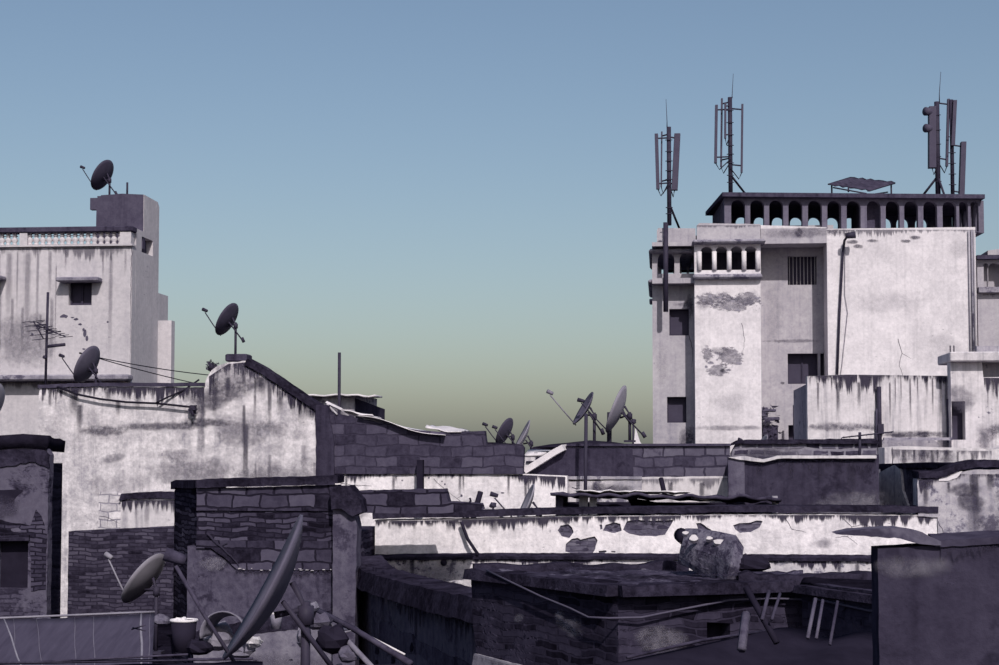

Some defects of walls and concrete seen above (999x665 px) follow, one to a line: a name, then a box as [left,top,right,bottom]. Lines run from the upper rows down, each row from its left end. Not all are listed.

peeling [694,292,761,312]
peeling [702,345,743,376]
damp [42,362,316,435]
damp [810,375,948,400]
damp [984,378,999,397]
spalling [558,520,673,553]
spalling [733,521,762,533]